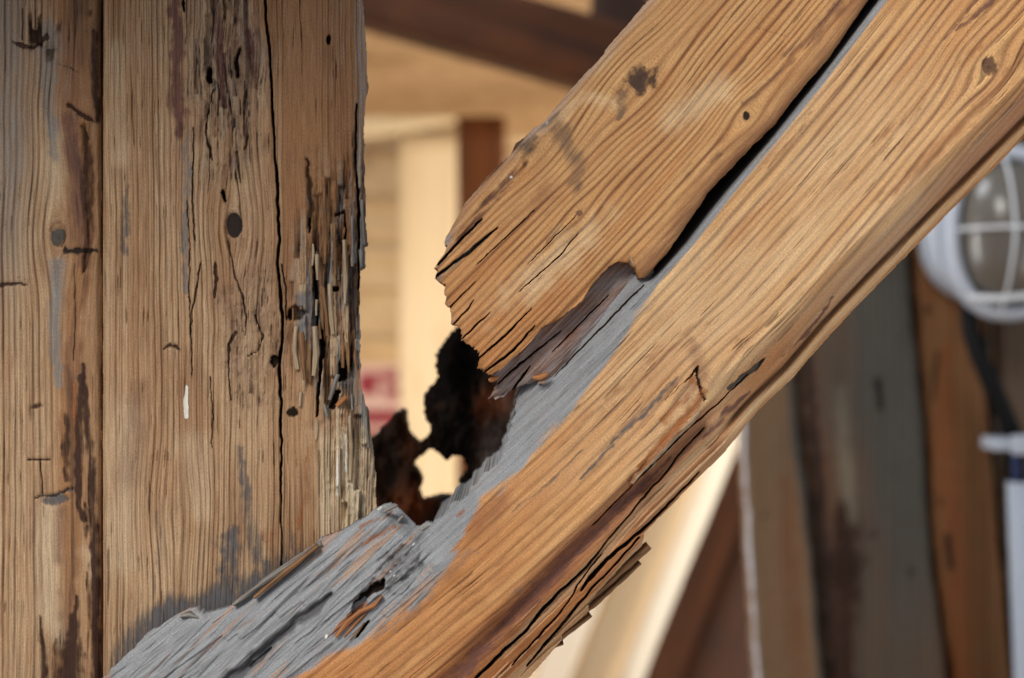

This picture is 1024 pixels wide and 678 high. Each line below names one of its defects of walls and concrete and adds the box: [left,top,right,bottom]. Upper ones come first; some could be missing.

crack [264,0,288,554]
peeling [291,192,366,496]
crack [435,211,644,391]
crack [474,366,746,678]